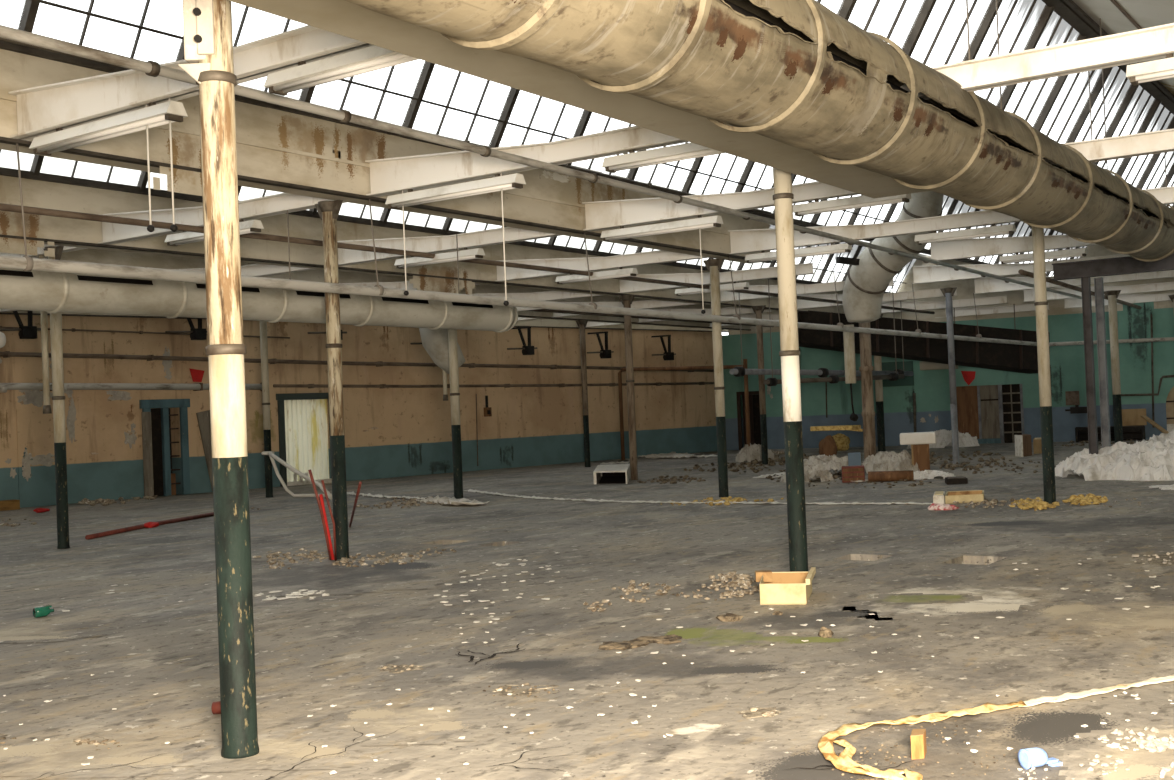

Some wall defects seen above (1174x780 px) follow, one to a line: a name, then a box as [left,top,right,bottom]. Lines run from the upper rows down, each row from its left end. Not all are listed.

rust [332,124,401,186]